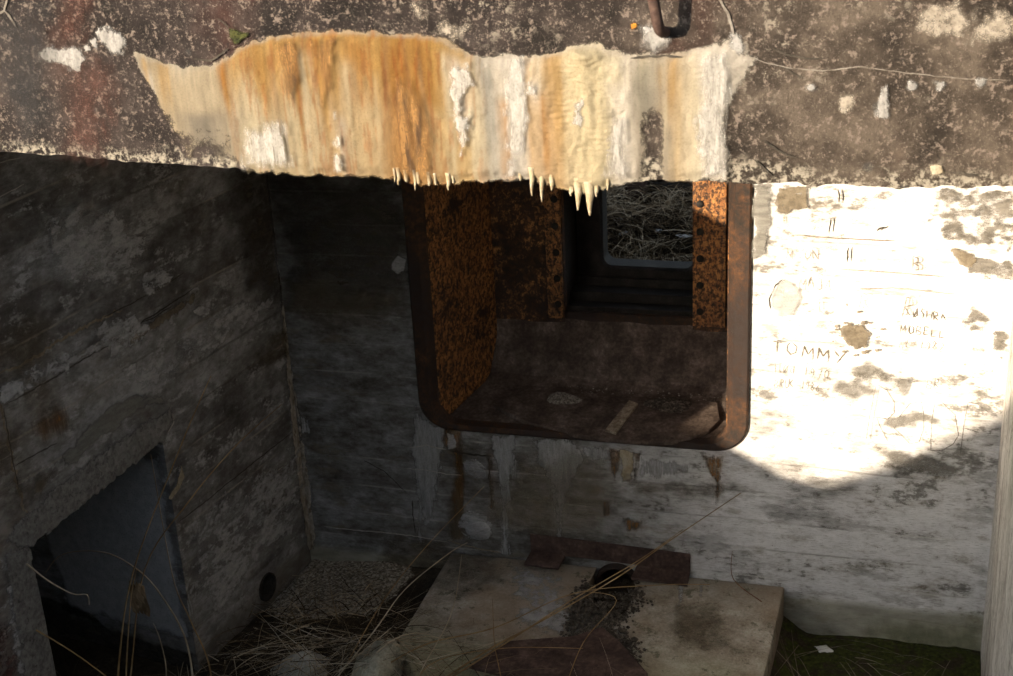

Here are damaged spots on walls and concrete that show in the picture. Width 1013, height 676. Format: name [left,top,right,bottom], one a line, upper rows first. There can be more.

leakage [833,363,884,398]
leakage [895,379,909,395]
leakage [883,411,936,428]
leakage [383,406,446,569]
corrosion [443,429,465,539]
leakage [491,435,519,555]
efflorescence [531,437,619,537]
corrosion [703,455,721,500]
leakage [881,452,963,477]